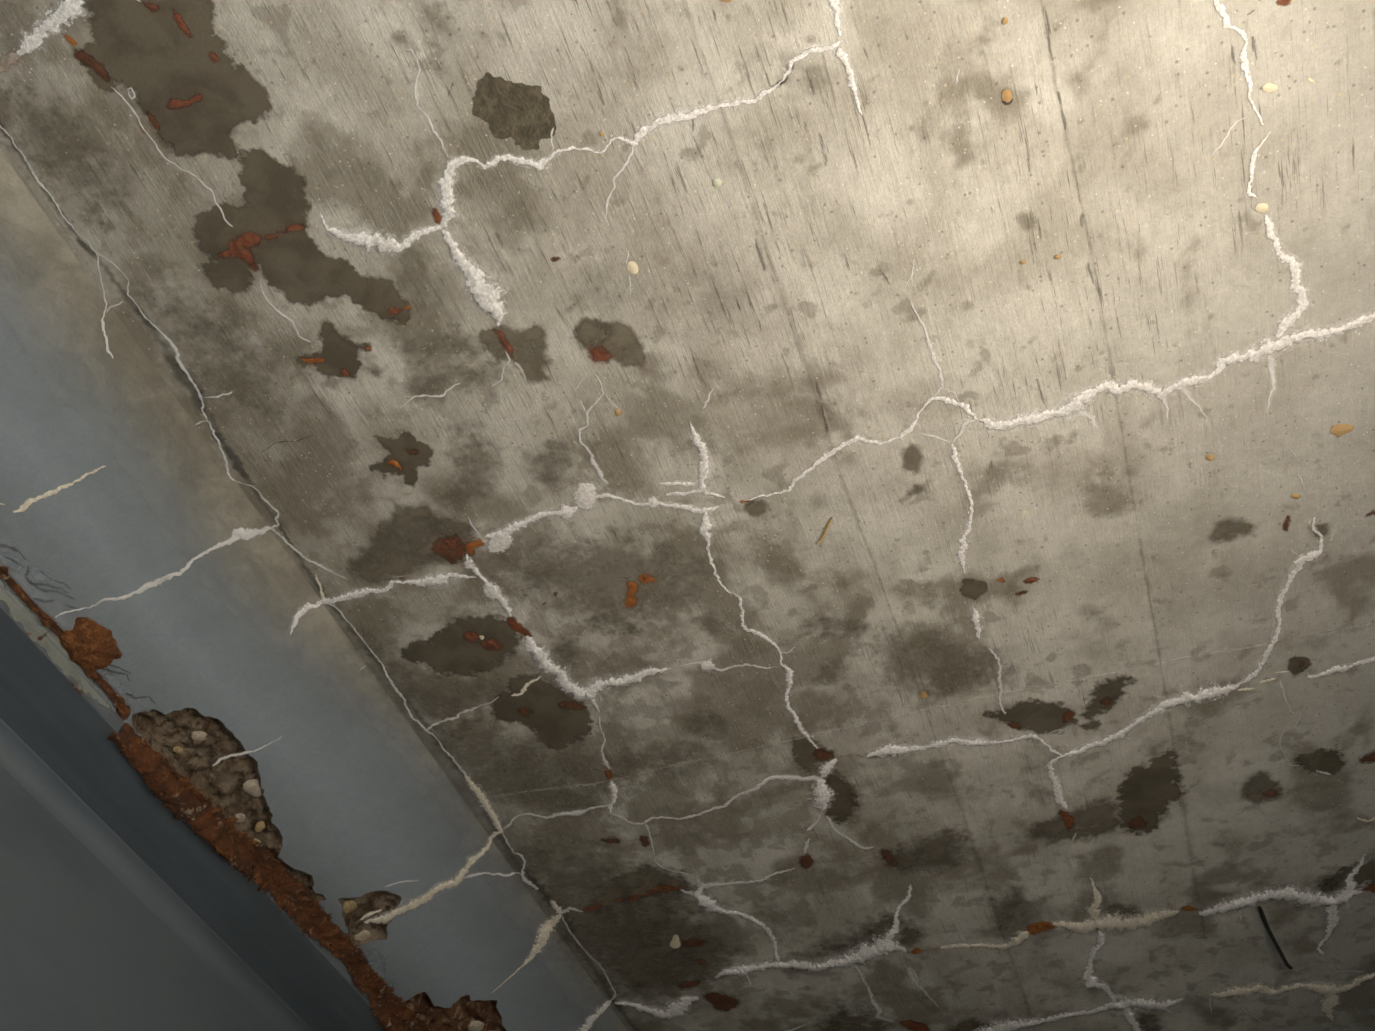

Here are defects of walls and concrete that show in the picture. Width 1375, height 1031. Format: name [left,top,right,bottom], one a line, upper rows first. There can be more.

crack [0,126,347,618]
spalling [0,545,401,987]
rust [0,565,433,1031]
water stain [64,0,411,324]
water stain [371,615,606,805]
crack [320,0,863,409]
water stain [575,318,645,367]
crack [468,373,818,749]
crack [290,517,1375,1031]
crack [741,215,1375,573]
water stain [983,676,1138,734]
spalling [404,992,507,1031]